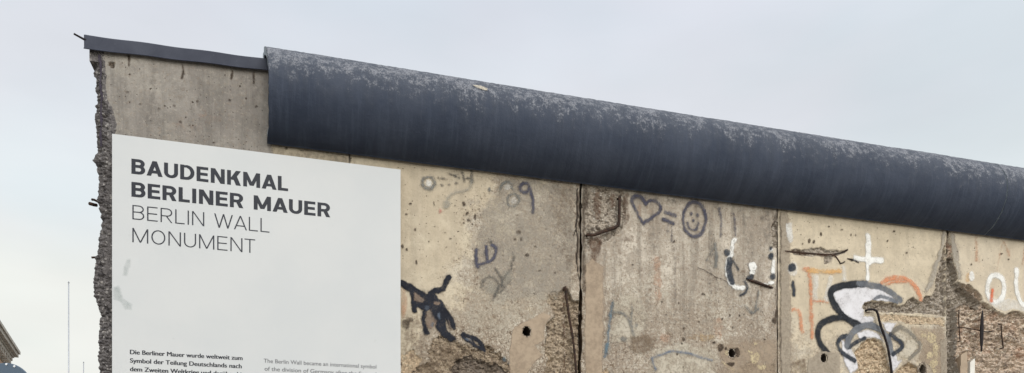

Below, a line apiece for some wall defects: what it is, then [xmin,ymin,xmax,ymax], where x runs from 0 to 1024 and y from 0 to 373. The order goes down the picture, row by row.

spalling [88,51,117,373]
spalling [542,286,580,373]
spalling [854,231,1024,373]